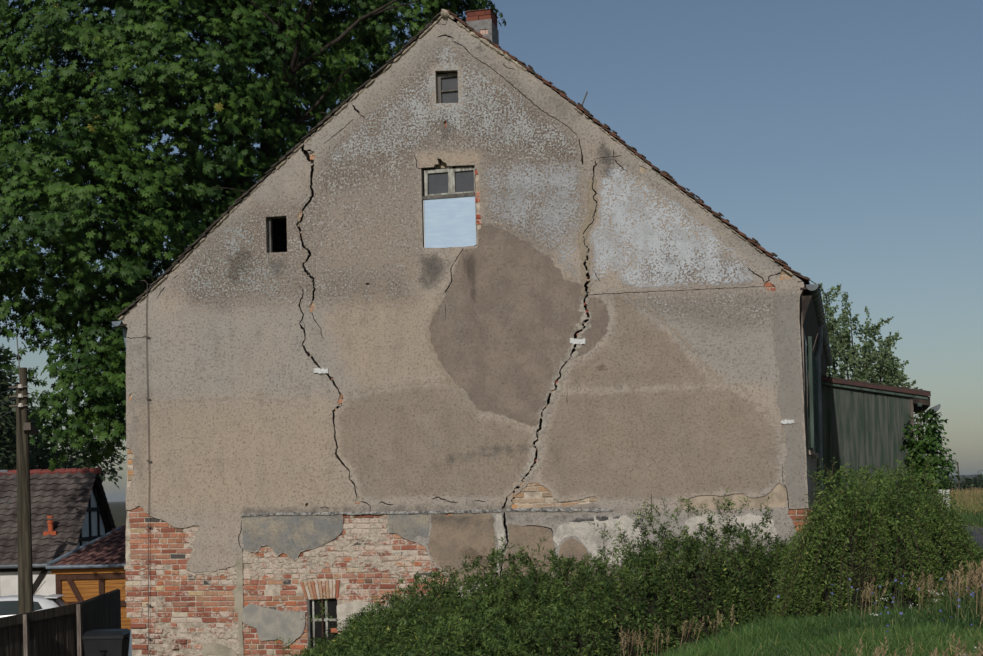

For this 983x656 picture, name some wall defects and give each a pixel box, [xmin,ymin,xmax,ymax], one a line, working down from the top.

crack [295,105,394,510]
crack [431,20,781,574]
spalling [124,498,506,656]
spalling [507,482,598,509]
peeling [553,515,646,565]